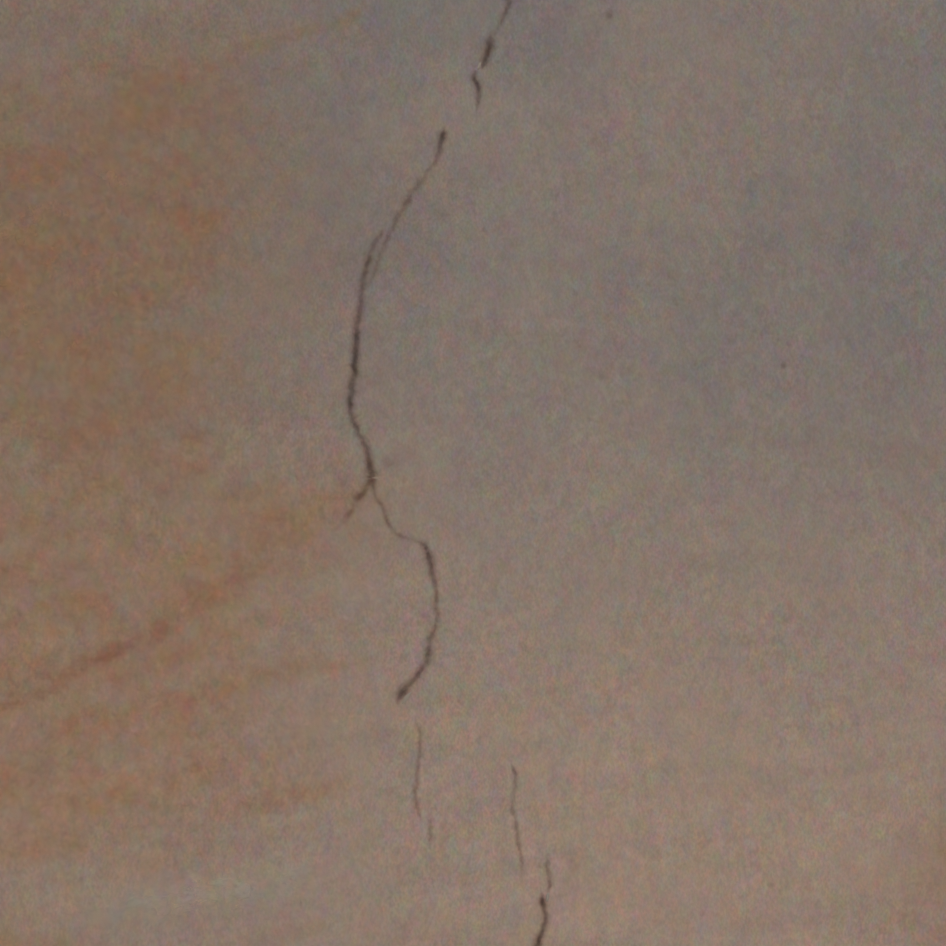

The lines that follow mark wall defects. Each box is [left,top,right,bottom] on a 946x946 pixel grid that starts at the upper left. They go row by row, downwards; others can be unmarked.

crack [474,42,491,86]
crack [351,333,359,374]
crack [359,459,374,496]